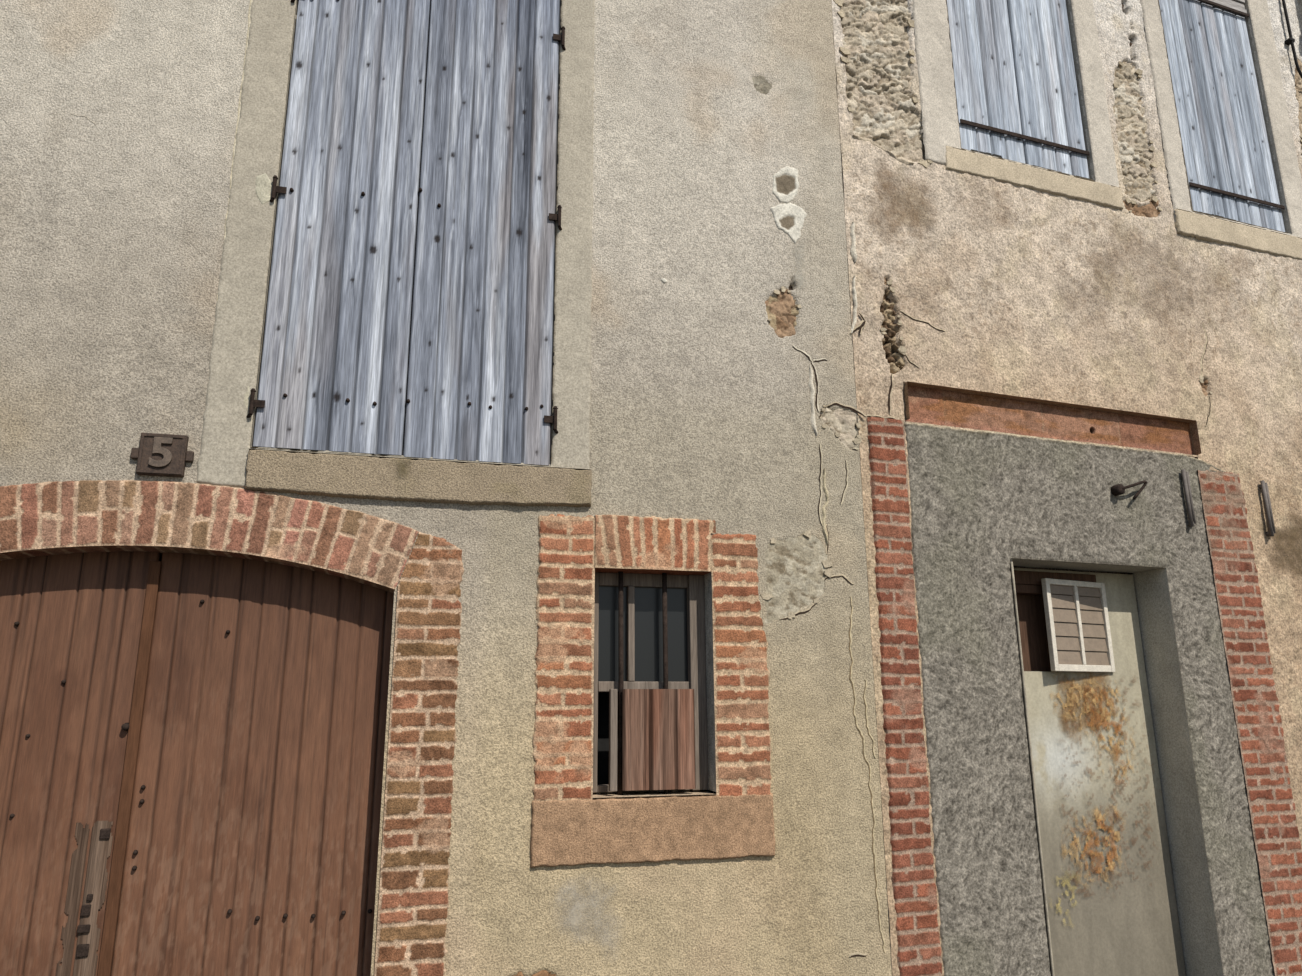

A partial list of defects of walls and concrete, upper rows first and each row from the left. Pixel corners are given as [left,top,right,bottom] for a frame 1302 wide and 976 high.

spalling [834,0,933,168]
spalling [1113,61,1163,217]
spalling [1294,59,1302,154]
spalling [765,286,801,338]
crack [850,312,866,334]
spalling [880,277,907,374]
crack [900,311,945,332]
crack [793,345,919,528]
corrosion [1056,674,1132,776]
corrosion [1064,808,1121,882]